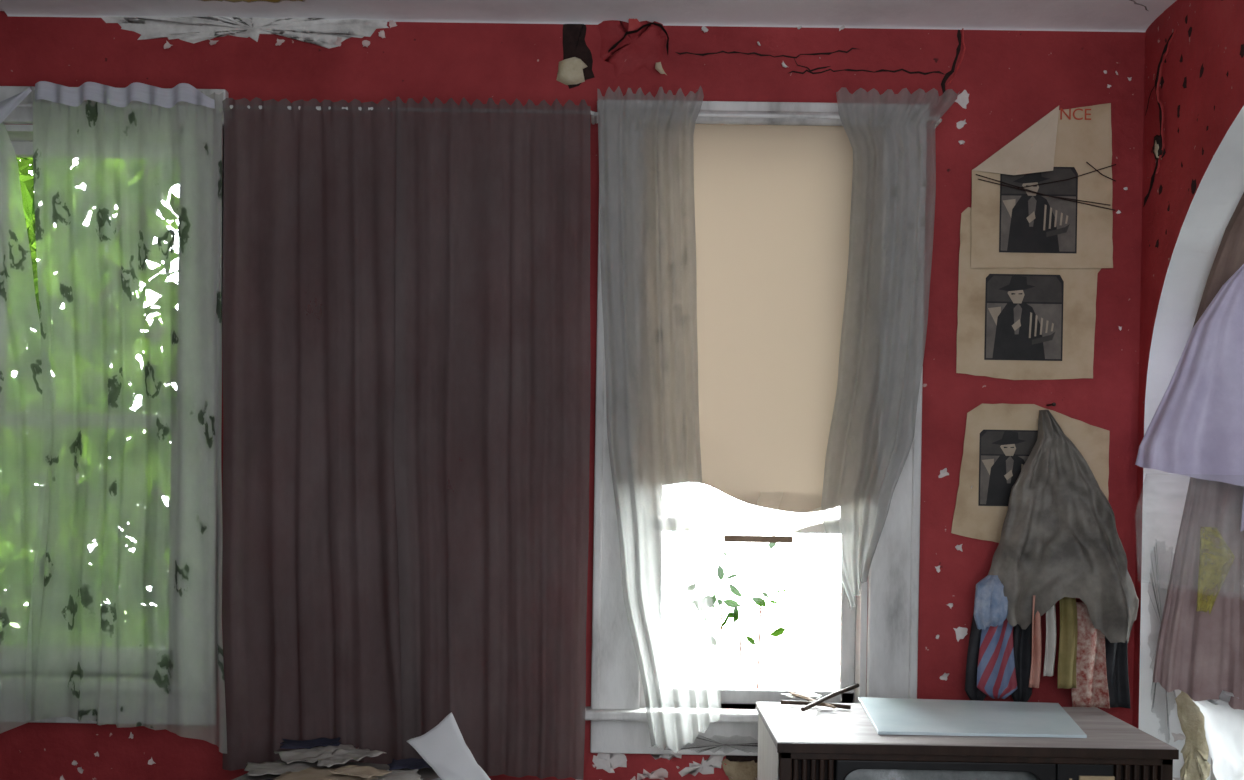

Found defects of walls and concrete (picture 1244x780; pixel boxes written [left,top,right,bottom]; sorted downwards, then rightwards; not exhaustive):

spalling [102,16,397,49]
crack [676,28,966,93]
crack [1143,29,1176,207]
peeling [593,753,758,780]